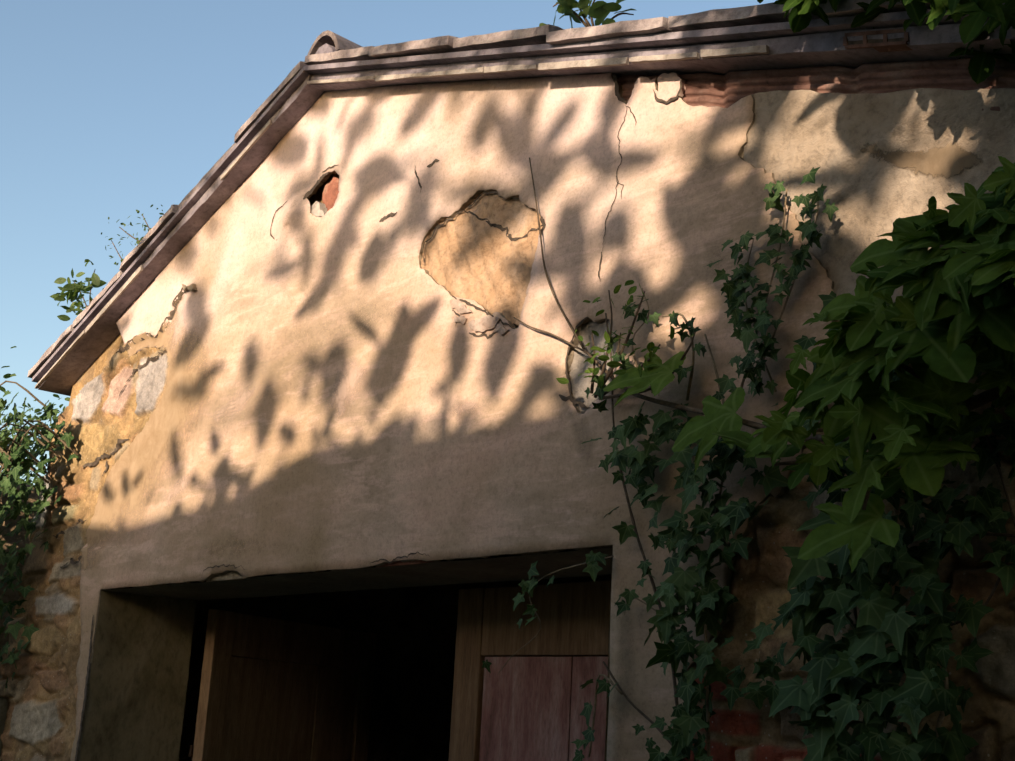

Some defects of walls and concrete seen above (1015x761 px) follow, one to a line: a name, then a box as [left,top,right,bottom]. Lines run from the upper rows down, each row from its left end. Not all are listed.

spalling [613,72,686,104]
crack [414,159,440,192]
spalling [421,190,546,339]
crack [598,106,636,279]
spalling [741,88,1015,297]
flaking render [80,283,213,570]
spalling [565,317,616,414]
spalling [201,564,253,582]